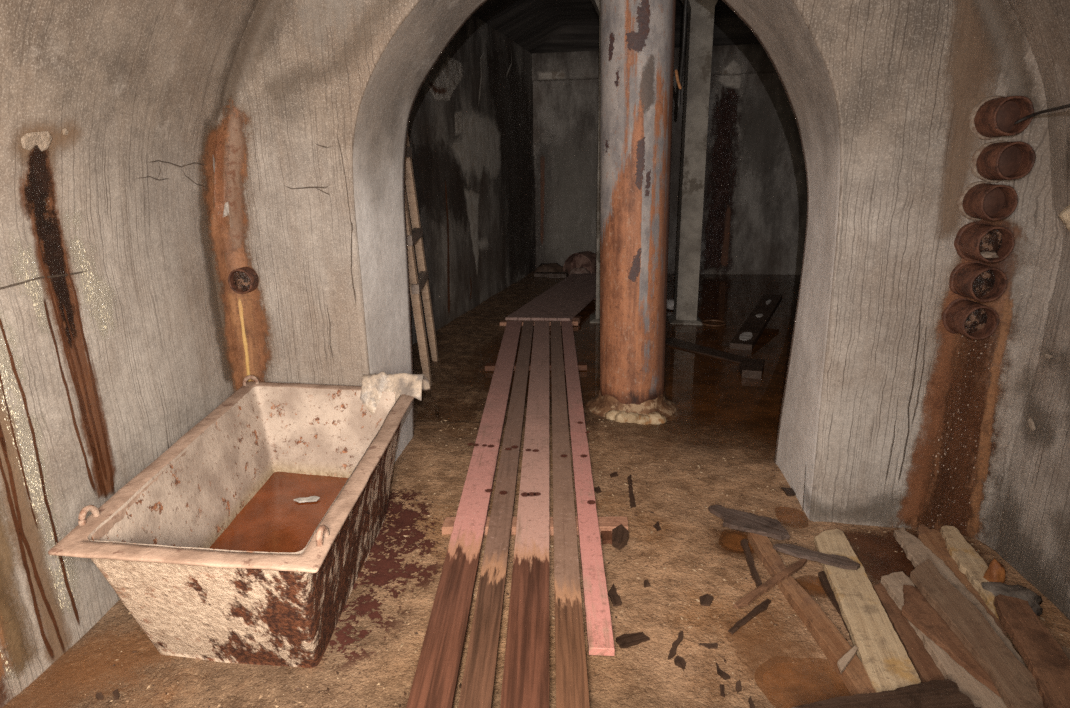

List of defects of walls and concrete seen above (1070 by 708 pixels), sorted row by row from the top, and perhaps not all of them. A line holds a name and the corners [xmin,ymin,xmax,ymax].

rust [0,319,79,661]
rust [20,146,115,497]
rust [204,101,270,391]
water stain [412,49,551,276]
rust [845,531,917,588]
rust [900,219,1022,555]